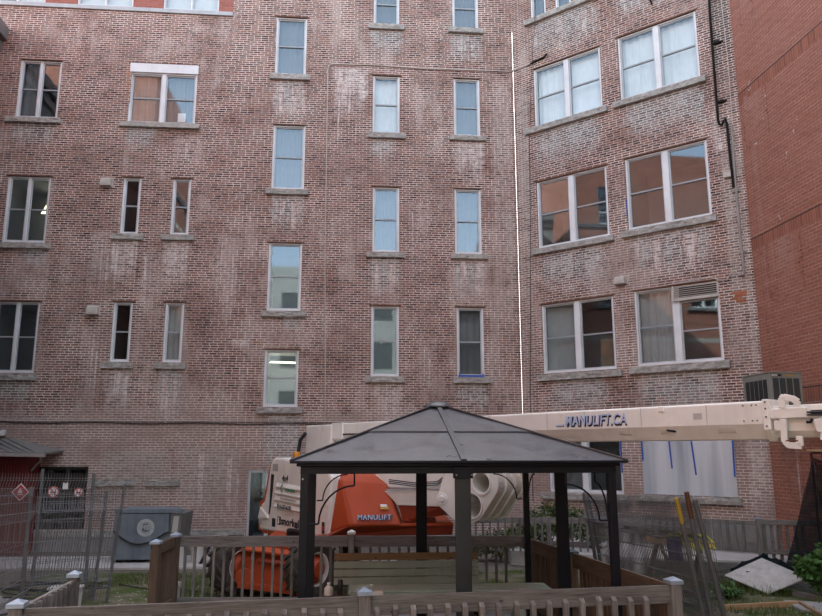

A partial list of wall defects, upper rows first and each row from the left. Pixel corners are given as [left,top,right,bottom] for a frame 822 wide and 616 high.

water stain [448,33,484,70]
water stain [524,0,688,64]
water stain [269,80,309,123]
water stain [330,66,371,153]
water stain [617,0,804,407]